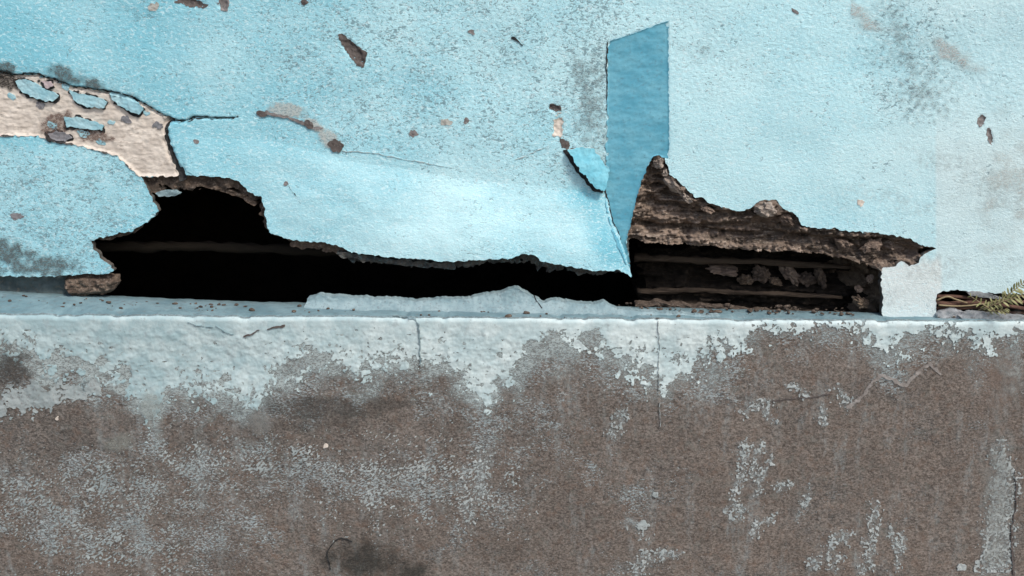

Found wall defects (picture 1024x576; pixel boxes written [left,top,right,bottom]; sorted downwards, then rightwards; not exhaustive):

peeling [338,34,367,68]
spalling [0,70,295,245]
spalling [256,102,344,153]
peeling [549,103,610,193]
water stain [0,354,28,384]
peeling [0,155,1024,576]